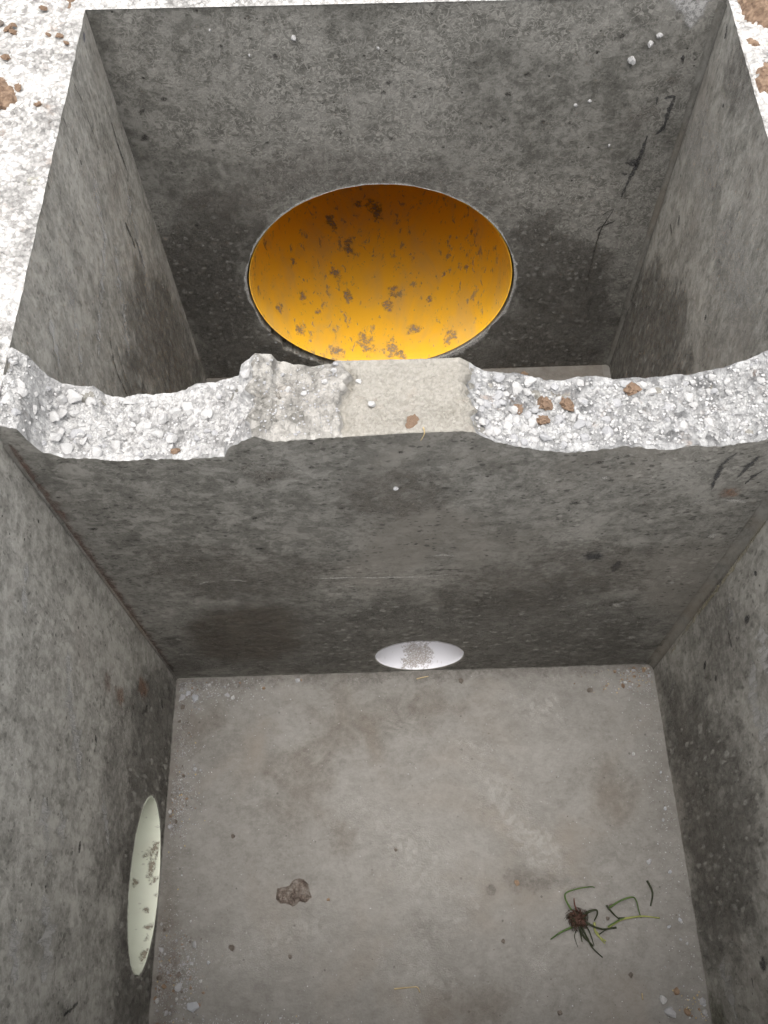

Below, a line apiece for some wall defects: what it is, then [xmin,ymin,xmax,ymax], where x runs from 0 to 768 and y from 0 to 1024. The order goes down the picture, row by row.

spalling [0,183,768,464]
crack [585,209,614,291]